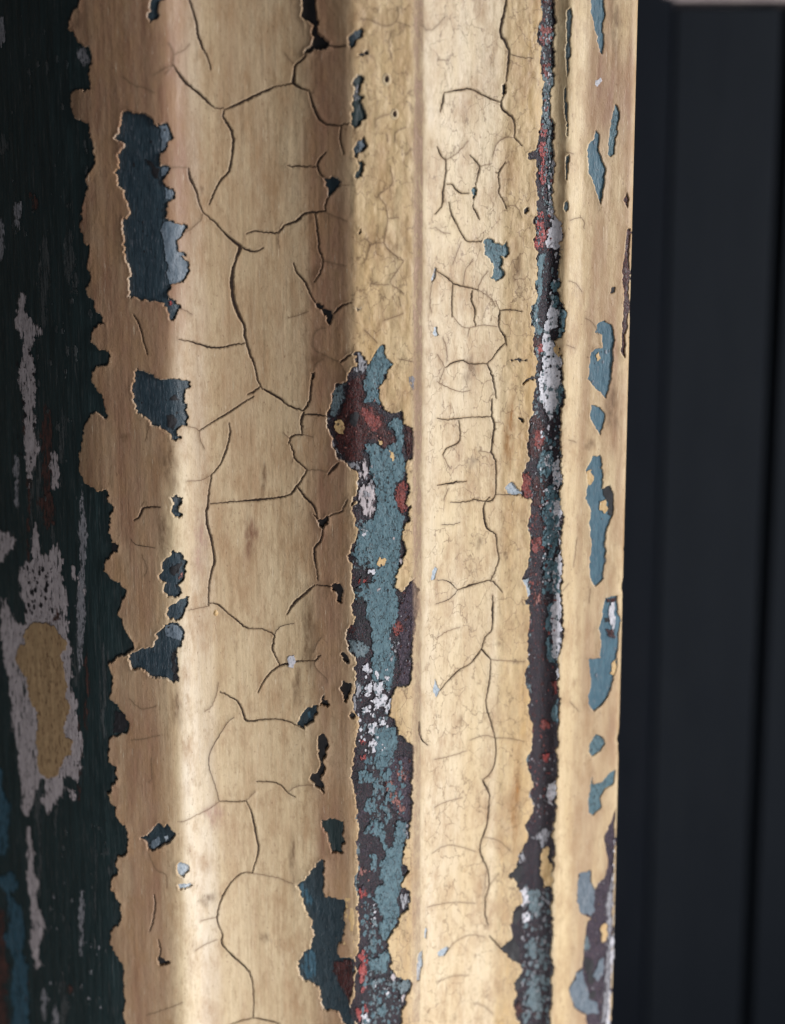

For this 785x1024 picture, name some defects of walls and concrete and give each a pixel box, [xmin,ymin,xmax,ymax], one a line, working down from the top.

peeling [351,75,367,179]
peeling [483,238,509,281]
peeling [587,105,619,204]
peeling [588,229,632,434]
peeling [0,0,192,1024]
crack [123,0,404,1024]
crack [418,0,533,949]
peeling [500,0,572,1024]
peeling [585,455,614,586]
peeling [297,345,423,1024]
peeling [588,596,620,710]
peeling [569,811,616,1024]